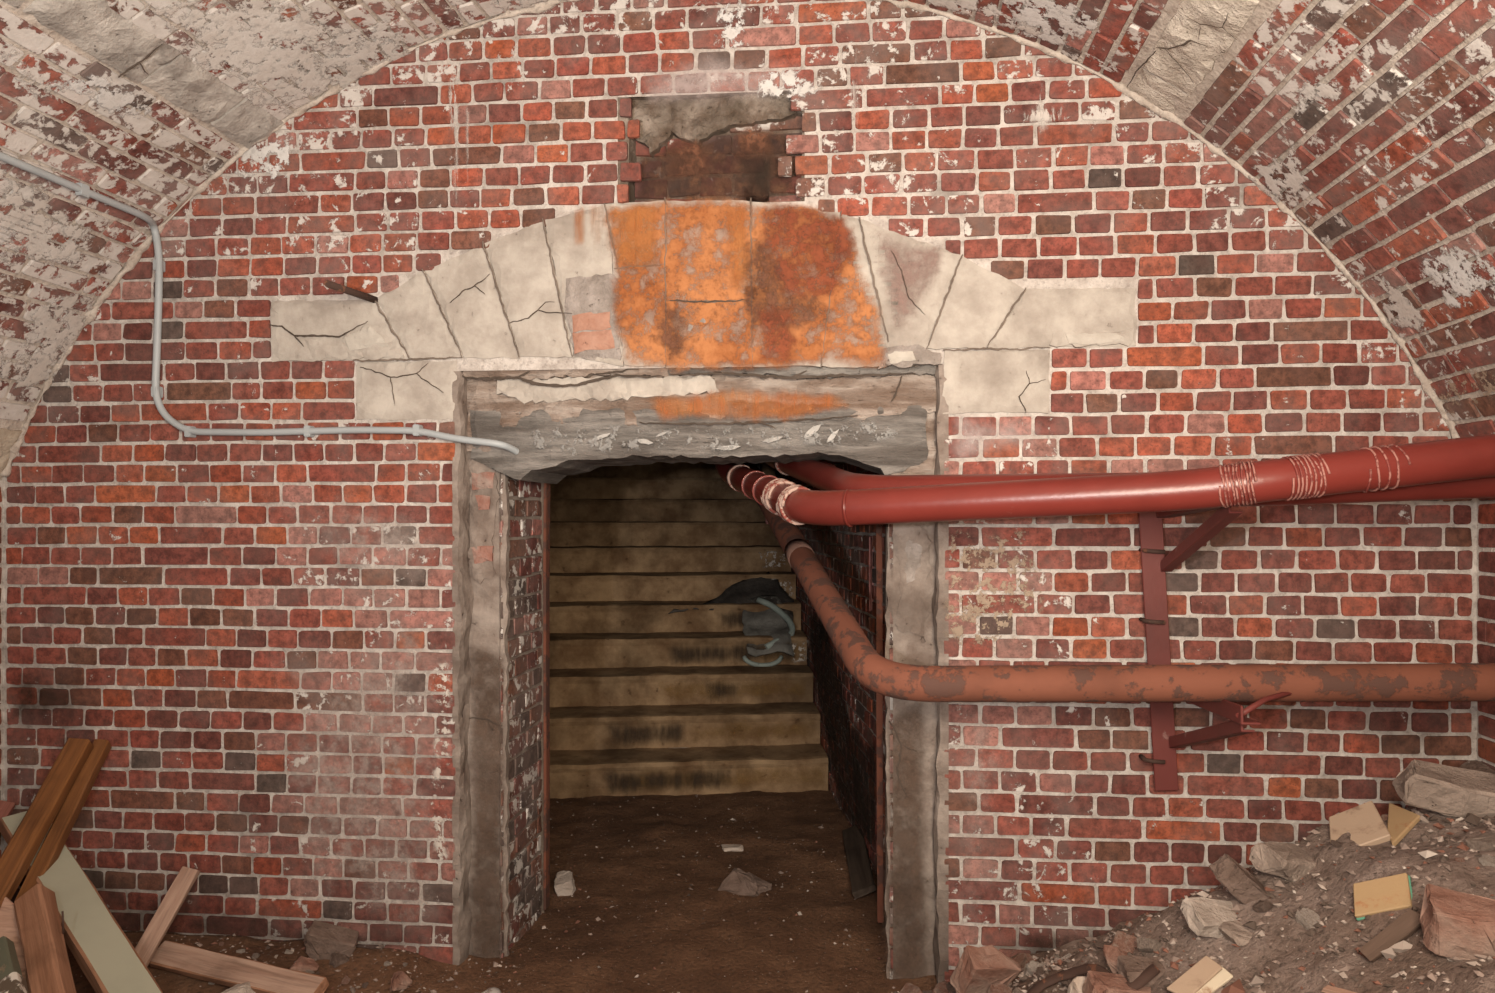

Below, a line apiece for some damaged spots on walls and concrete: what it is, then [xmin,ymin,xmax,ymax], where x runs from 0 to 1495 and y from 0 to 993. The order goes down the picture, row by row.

crack [1127,14,1237,87]
peeling [3,44,152,119]
water stain [640,127,791,200]
peeling [1248,146,1309,202]
crack [270,321,368,347]
corrosion [608,200,883,369]
corrosion [883,247,938,313]
peeling [1369,275,1426,334]
crack [360,363,915,404]
peeling [533,423,895,454]
corrosion [657,393,834,418]
crack [639,415,858,428]